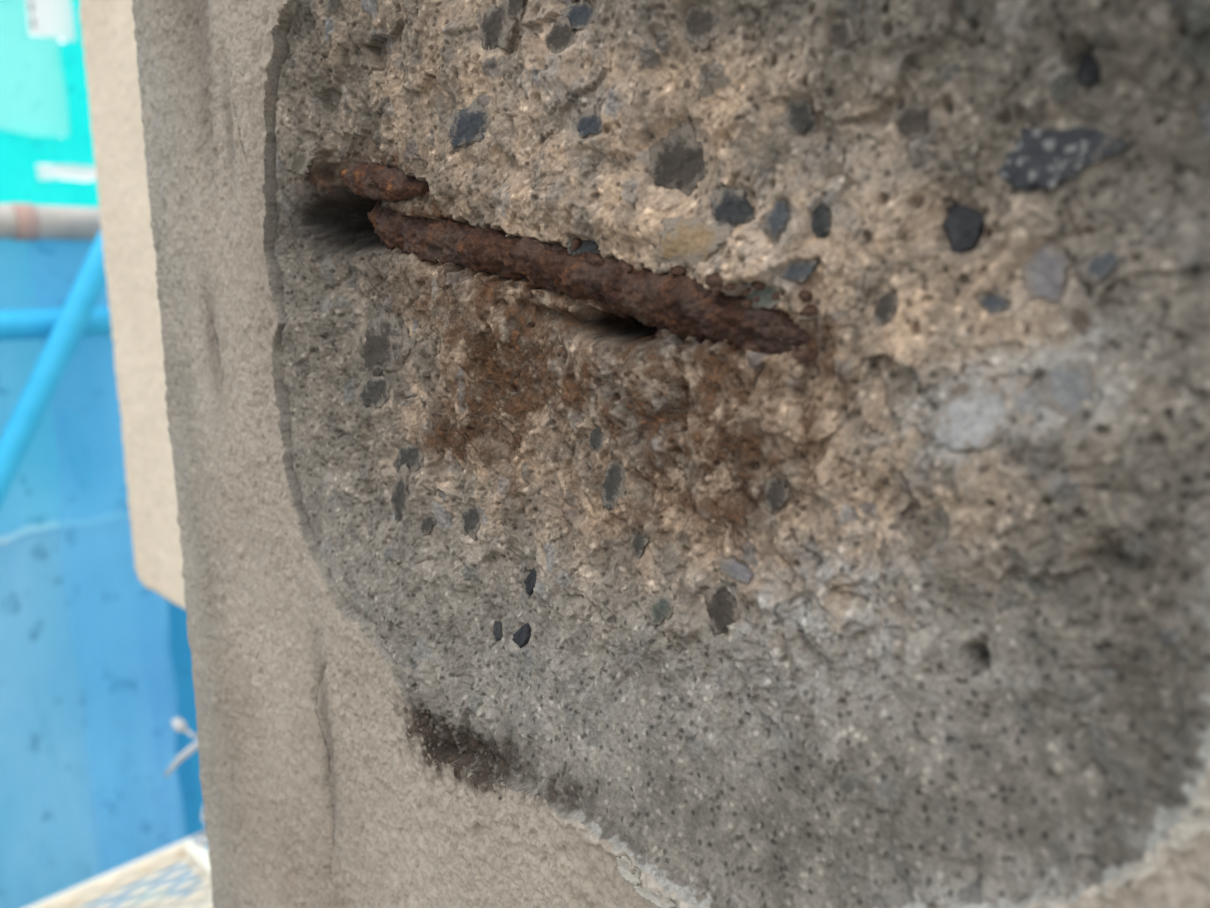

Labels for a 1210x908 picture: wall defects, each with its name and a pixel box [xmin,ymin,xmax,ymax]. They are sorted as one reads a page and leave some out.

corrosion [404,263,783,546]
corrosion [571,238,632,274]
spalling [262,0,1210,908]
corrosion [791,290,836,404]